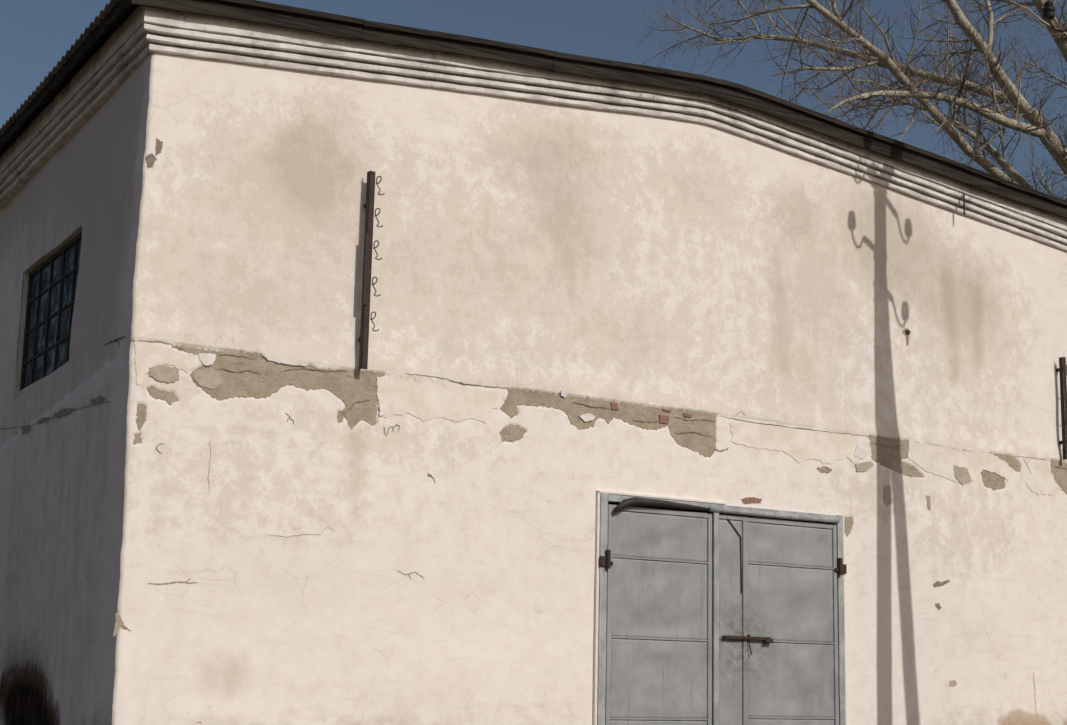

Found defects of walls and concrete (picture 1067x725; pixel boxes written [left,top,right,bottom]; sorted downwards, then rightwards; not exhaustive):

flaking render [21,408,75,434]
flaking render [134,341,717,457]
flaking render [883,486,892,505]
flaking render [854,435,1067,496]
crack [148,578,197,586]
leakage [0,662,59,725]